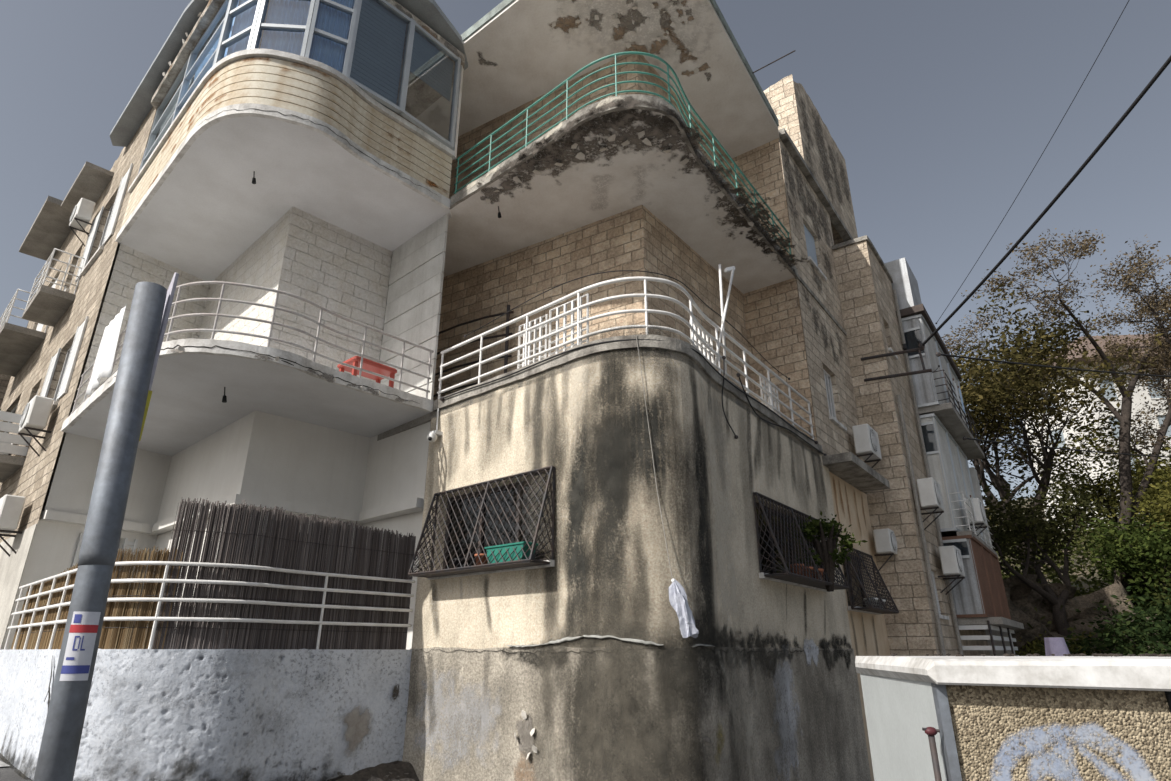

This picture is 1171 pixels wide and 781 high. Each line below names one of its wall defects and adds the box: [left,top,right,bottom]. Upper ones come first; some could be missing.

spalling [550,0,711,81]
spalling [465,166,503,204]
damp [490,96,850,361]
damp [502,328,799,781]
damp [820,619,879,670]
damp [344,706,371,752]